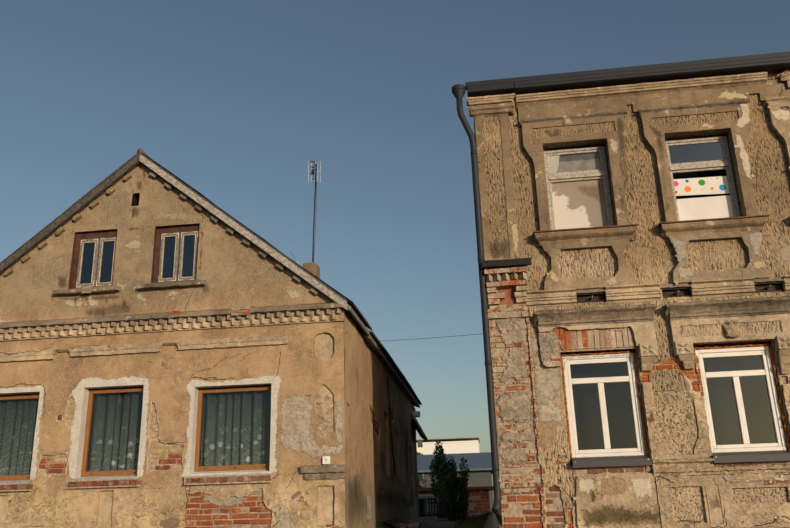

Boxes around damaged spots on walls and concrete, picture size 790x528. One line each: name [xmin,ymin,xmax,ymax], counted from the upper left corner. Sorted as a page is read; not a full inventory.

spalling [767,69,790,87]
crack [190,354,245,380]
spalling [494,318,638,465]
spalling [636,356,704,399]
spalling [146,400,185,474]
flaking render [278,391,345,458]
spalling [368,403,380,441]
spalling [37,451,69,477]
spalling [160,487,298,528]
spalling [503,472,655,528]